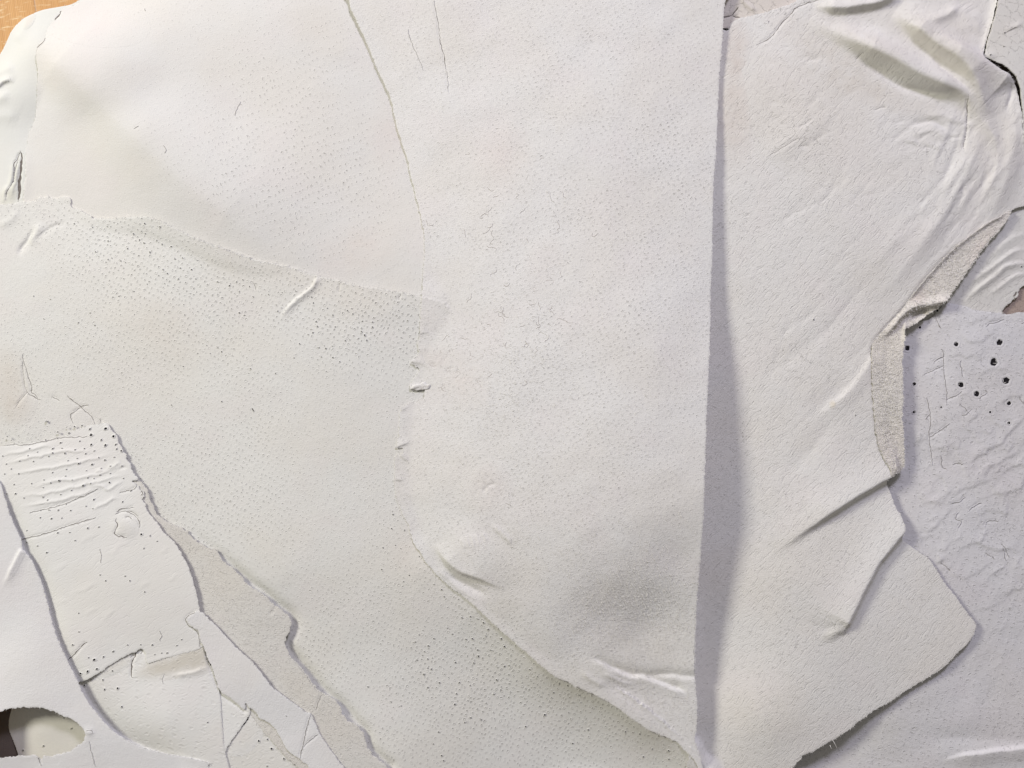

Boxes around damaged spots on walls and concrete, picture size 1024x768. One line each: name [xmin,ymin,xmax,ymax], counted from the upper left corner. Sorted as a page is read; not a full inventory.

crack [408,5,448,89]
peeling [126,643,212,682]